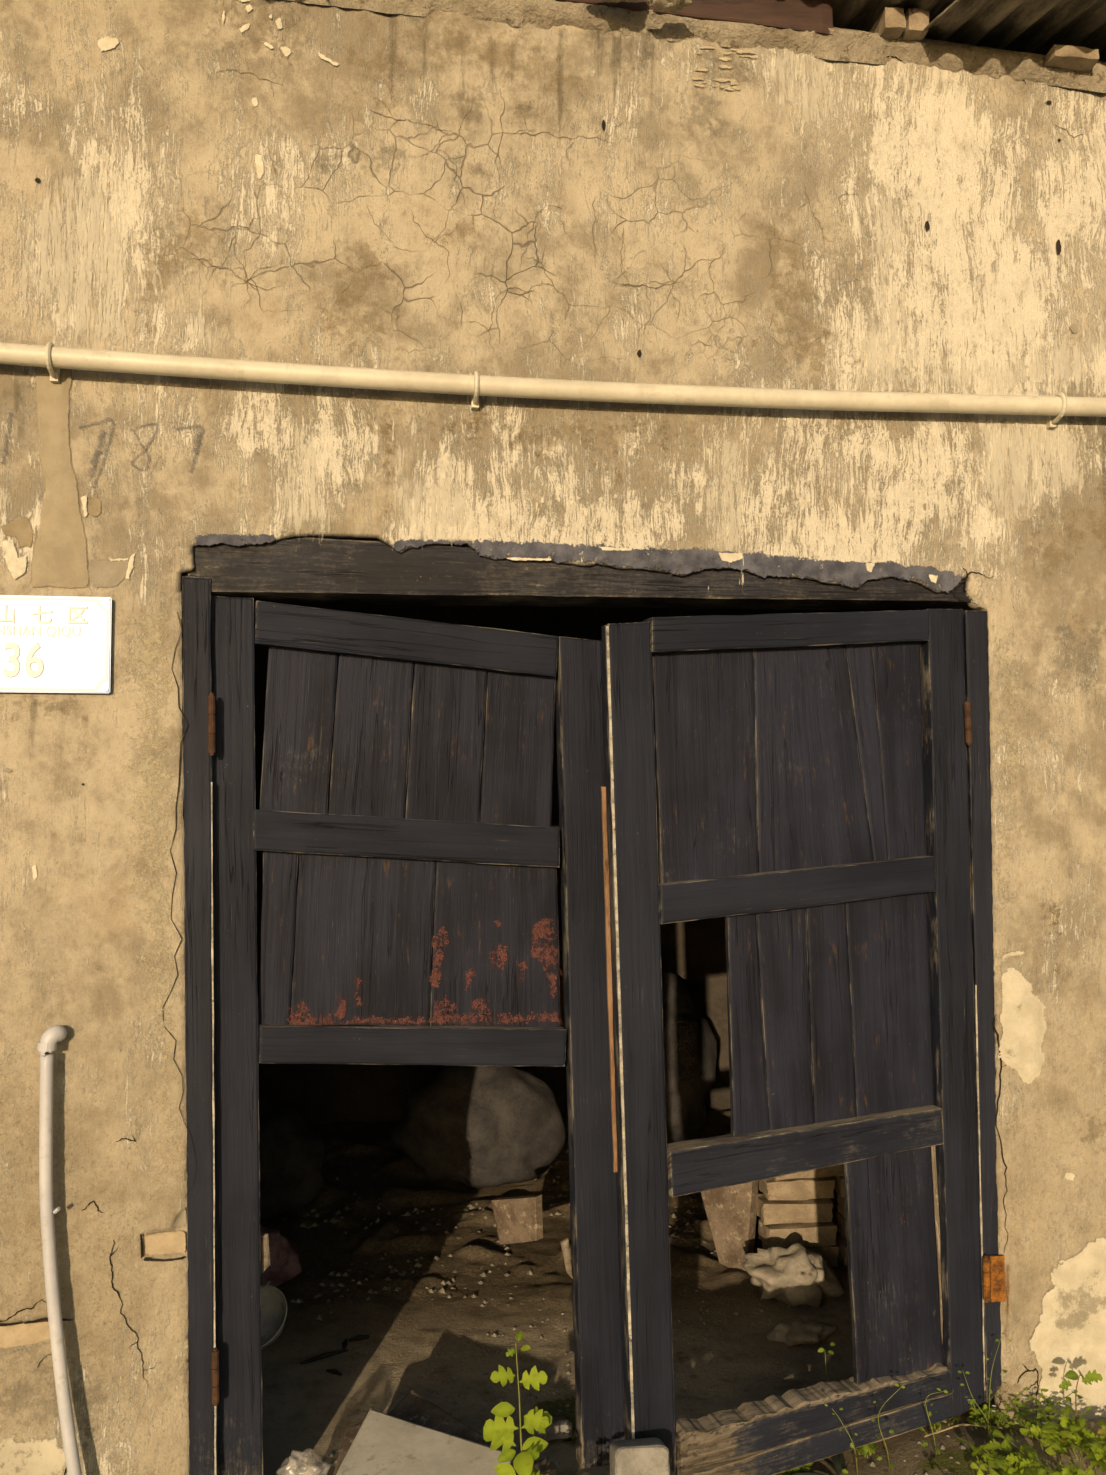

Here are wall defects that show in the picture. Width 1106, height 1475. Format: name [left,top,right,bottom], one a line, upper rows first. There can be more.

crack [220,59,288,99]
crack [190,214,282,303]
crack [366,89,751,354]
peeling [194,533,275,547]
peeling [394,538,962,593]
crack [82,1201,153,1389]
peeling [1029,1237,1106,1424]